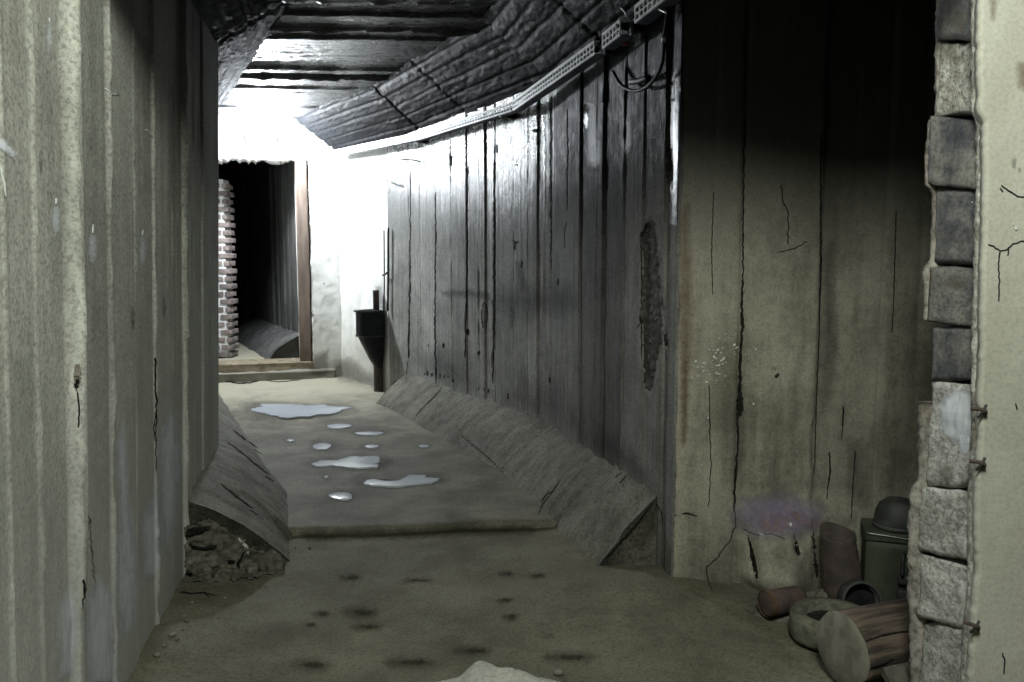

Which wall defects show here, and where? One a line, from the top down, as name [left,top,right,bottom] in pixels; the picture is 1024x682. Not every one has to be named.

crack [779,184,807,252]
crack [988,240,1024,301]
spalling [636,222,668,391]
crack [706,121,746,590]
crack [151,357,159,469]
crack [461,435,503,472]
crack [538,479,561,513]
spalling [184,518,286,582]